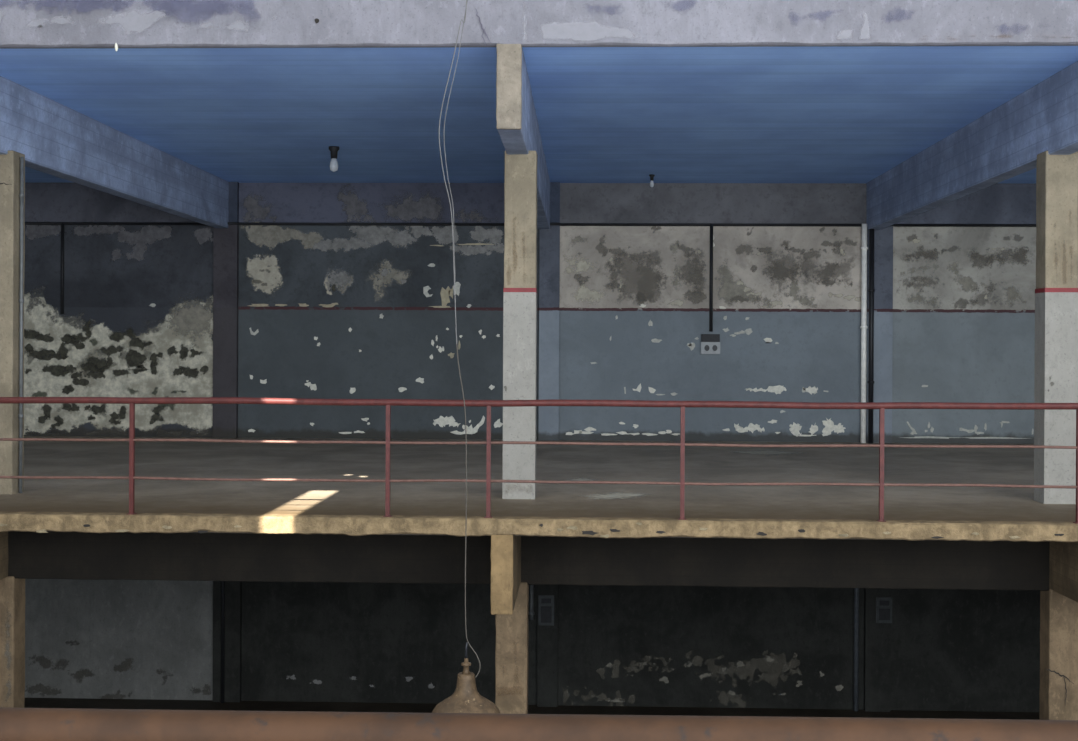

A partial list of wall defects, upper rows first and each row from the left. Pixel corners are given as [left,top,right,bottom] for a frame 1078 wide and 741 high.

peeling [241,184,504,256]
peeling [25,221,173,261]
water stain [897,234,1027,308]
peeling [423,282,471,308]
peeling [430,328,462,359]
peeling [24,287,213,437]
peeling [624,383,677,396]
peeling [746,385,786,394]
peeling [433,415,503,435]
peeling [566,422,679,436]
peeling [723,410,846,436]